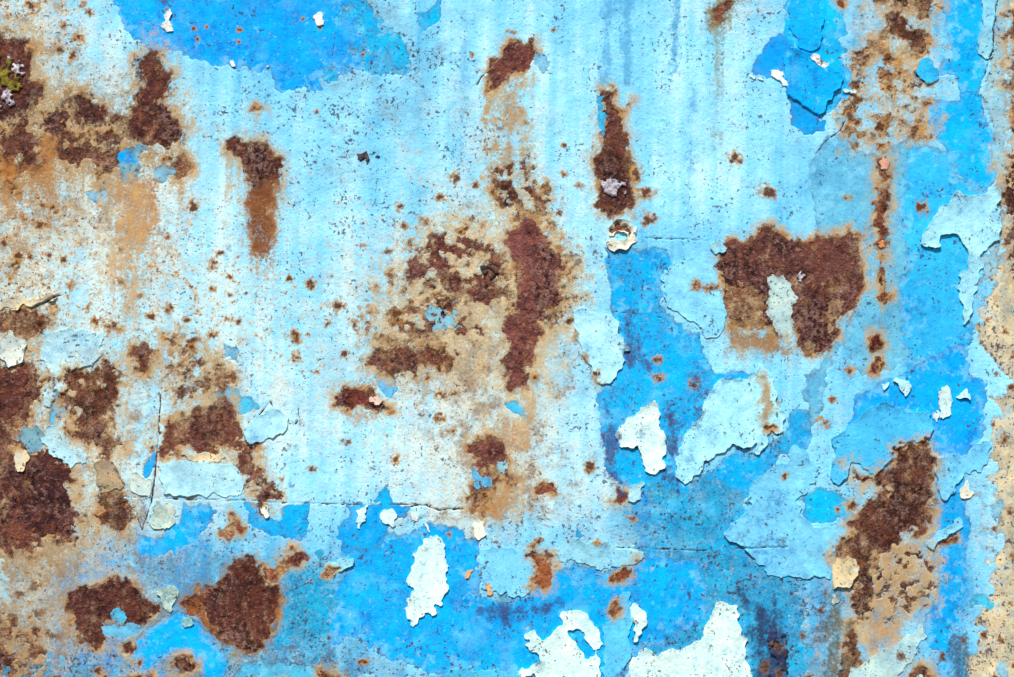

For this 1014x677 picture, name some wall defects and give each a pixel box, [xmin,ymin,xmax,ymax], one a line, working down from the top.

peeling [113,0,411,93]
peeling [117,142,148,185]
rust [0,0,312,677]
peeling [101,585,228,677]
peeling [128,445,217,559]
peeling [207,387,260,415]
rust [330,29,594,524]
rust [583,457,597,474]
rust [561,83,658,238]
peeling [234,0,1014,677]
rust [691,0,950,434]
rust [824,434,960,677]